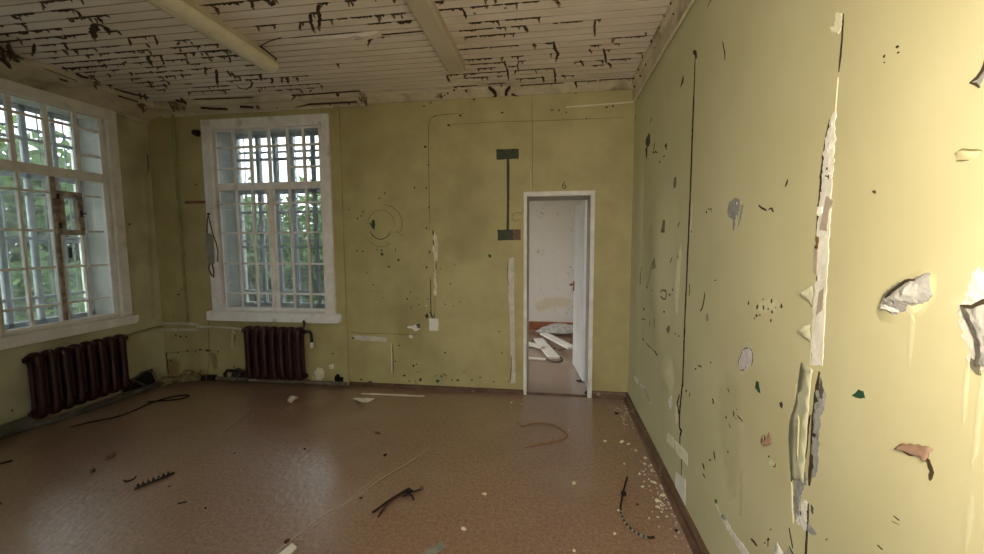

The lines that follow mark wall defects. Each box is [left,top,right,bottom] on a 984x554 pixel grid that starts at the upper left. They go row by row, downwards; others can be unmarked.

peeling [0,0,367,114]
peeling [298,0,412,33]
peeling [435,0,655,99]
peeling [829,12,842,34]
flaking render [969,62,984,88]
flaking render [727,198,744,230]
crack [677,50,697,475]
peeling [779,109,837,540]
flaking render [937,261,984,379]
flaking render [736,337,760,393]
peeling [894,443,934,481]